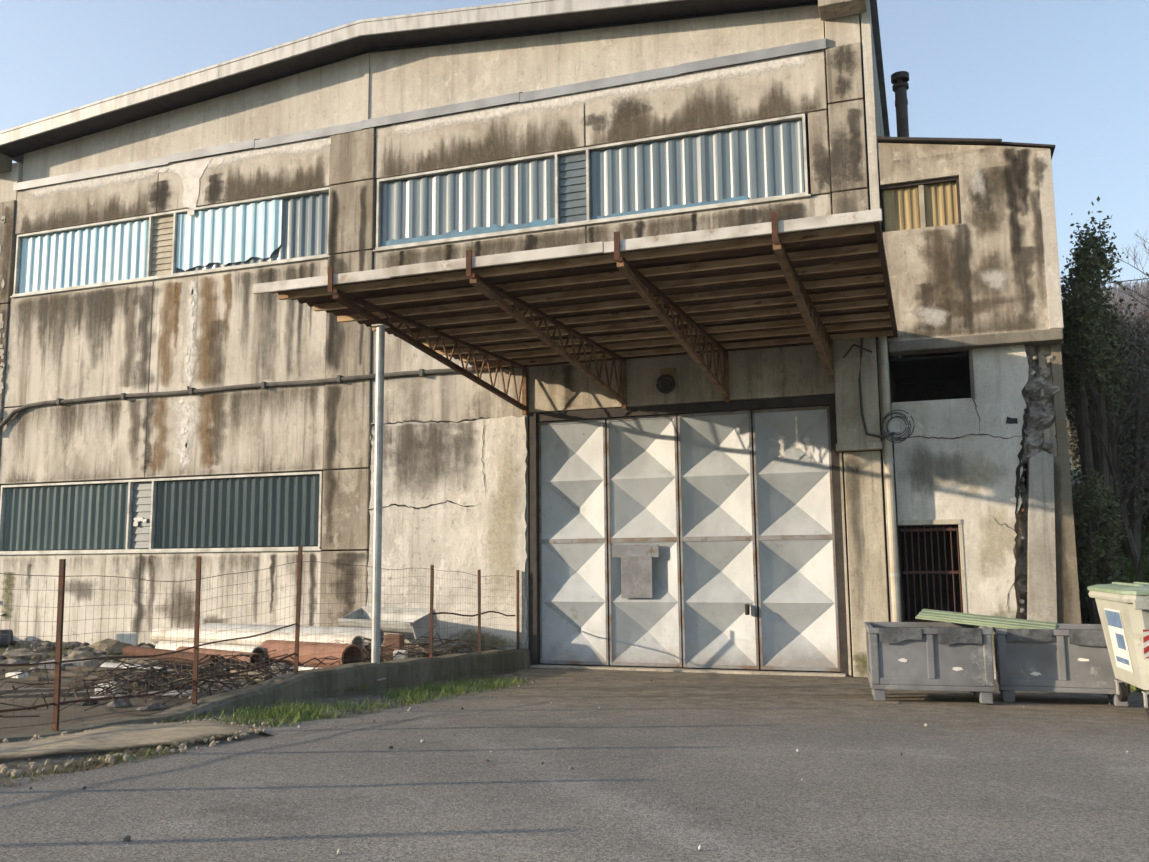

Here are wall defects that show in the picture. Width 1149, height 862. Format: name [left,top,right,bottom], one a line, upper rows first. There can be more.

water stain [383,124,575,176]
water stain [586,88,816,143]
water stain [831,47,853,94]
water stain [1,180,168,296]
water stain [386,203,804,268]
water stain [909,149,1045,338]
water stain [19,286,155,476]
efflorescence [172,281,198,468]
water stain [231,390,284,422]
crack [368,417,491,511]
crack [897,399,1029,619]
spalling [1006,345,1066,620]